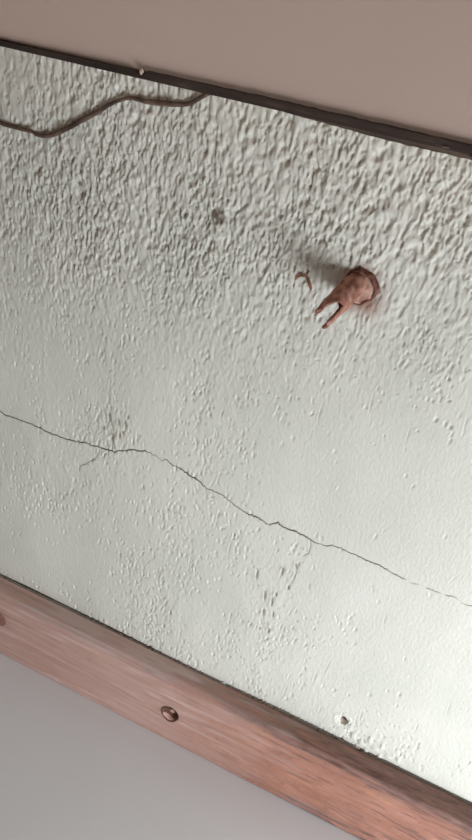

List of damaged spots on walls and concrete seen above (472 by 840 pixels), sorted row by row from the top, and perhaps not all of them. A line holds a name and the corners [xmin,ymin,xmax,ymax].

corrosion [293,268,312,292]
crack [0,411,471,606]